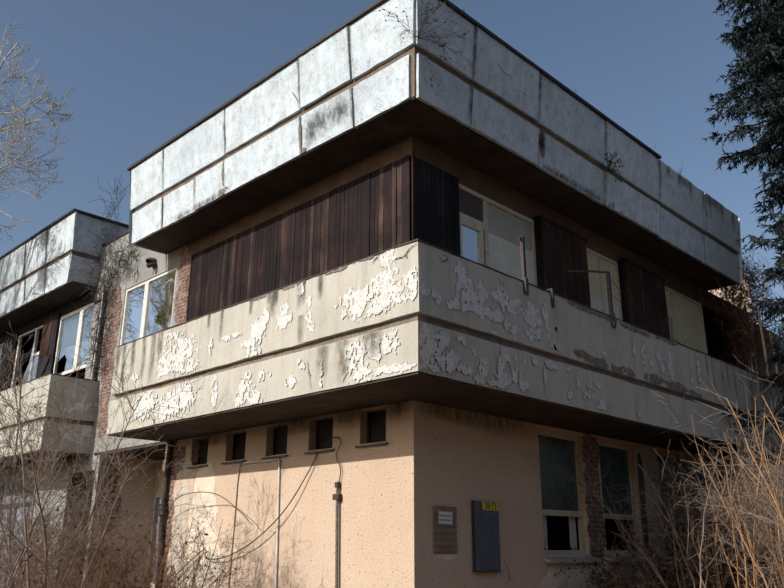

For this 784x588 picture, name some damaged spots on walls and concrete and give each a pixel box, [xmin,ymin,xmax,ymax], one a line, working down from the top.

leakage [299,90,353,138]
peeling [134,247,292,423]
peeling [283,280,314,332]
peeling [325,249,571,394]